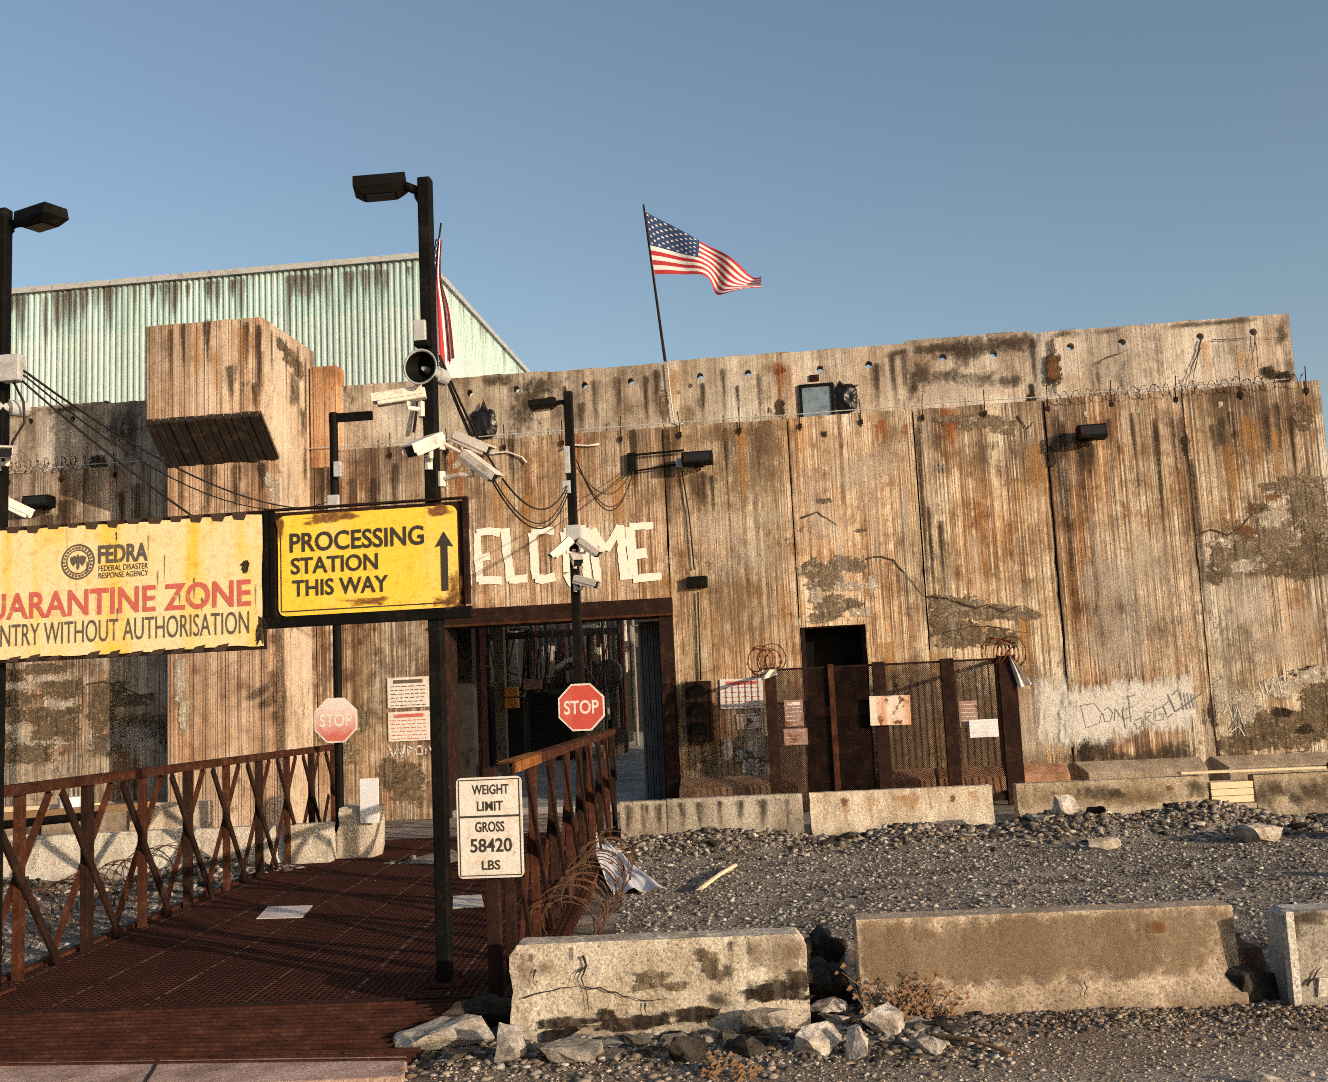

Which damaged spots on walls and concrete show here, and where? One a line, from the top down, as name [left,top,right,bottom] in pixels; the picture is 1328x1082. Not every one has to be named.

damp [721,368,762,405]
damp [873,333,1037,398]
spalling [1206,465,1328,586]
spalling [795,554,879,624]
spalling [928,593,1044,653]
spalling [5,654,190,767]
peeling [1023,664,1328,762]
crack [523,955,667,1016]
damp [711,995,727,1005]